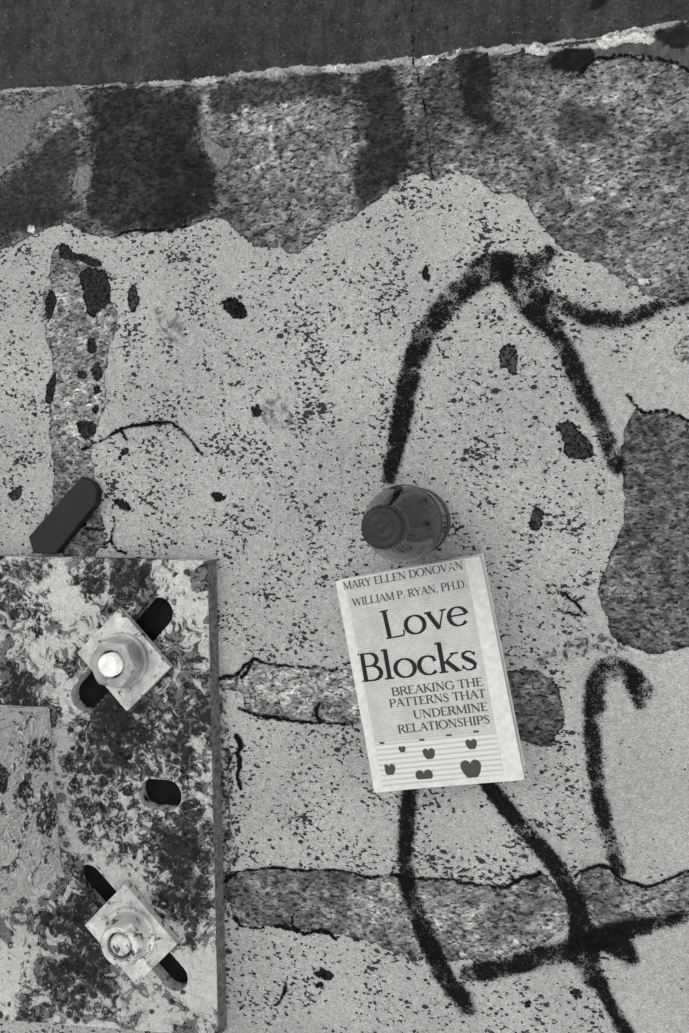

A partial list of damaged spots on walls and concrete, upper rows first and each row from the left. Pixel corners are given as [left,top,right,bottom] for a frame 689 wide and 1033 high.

spalling [0,20,689,300]
spalling [221,297,247,319]
spalling [42,242,140,512]
spalling [498,343,518,376]
crack [81,420,203,456]
spalling [555,419,594,460]
spalling [598,409,689,656]
crack [219,657,338,681]
spalling [219,661,362,723]
spalling [507,668,566,747]
spalling [223,868,572,962]
spalling [577,867,689,930]